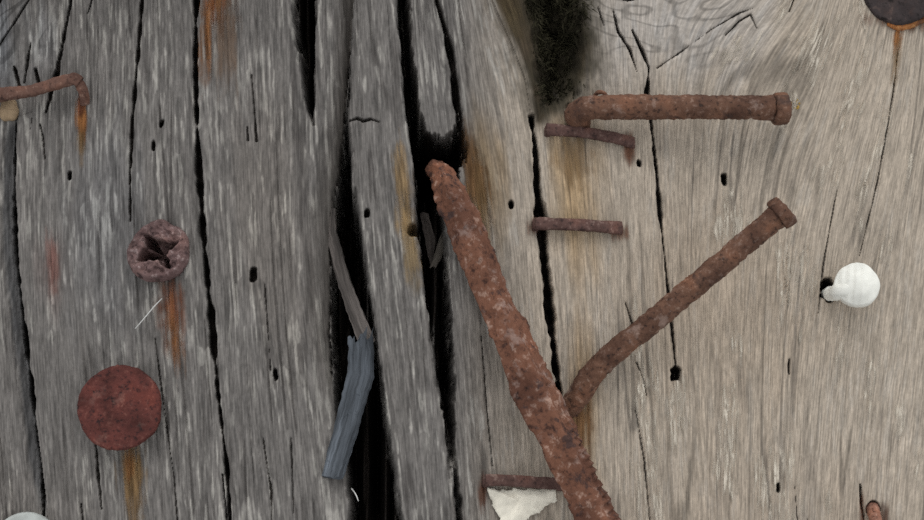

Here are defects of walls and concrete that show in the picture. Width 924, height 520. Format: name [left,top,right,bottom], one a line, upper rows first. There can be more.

rust [204,0,226,68]
crack [298,0,316,113]
crack [597,0,686,95]
crack [15,195,38,431]
rust [159,283,184,331]
crack [338,166,371,398]
rust [465,130,491,217]
crack [528,116,561,391]
crack [649,120,669,293]
crack [669,322,677,366]
rust [123,447,142,501]
crack [350,373,398,520]